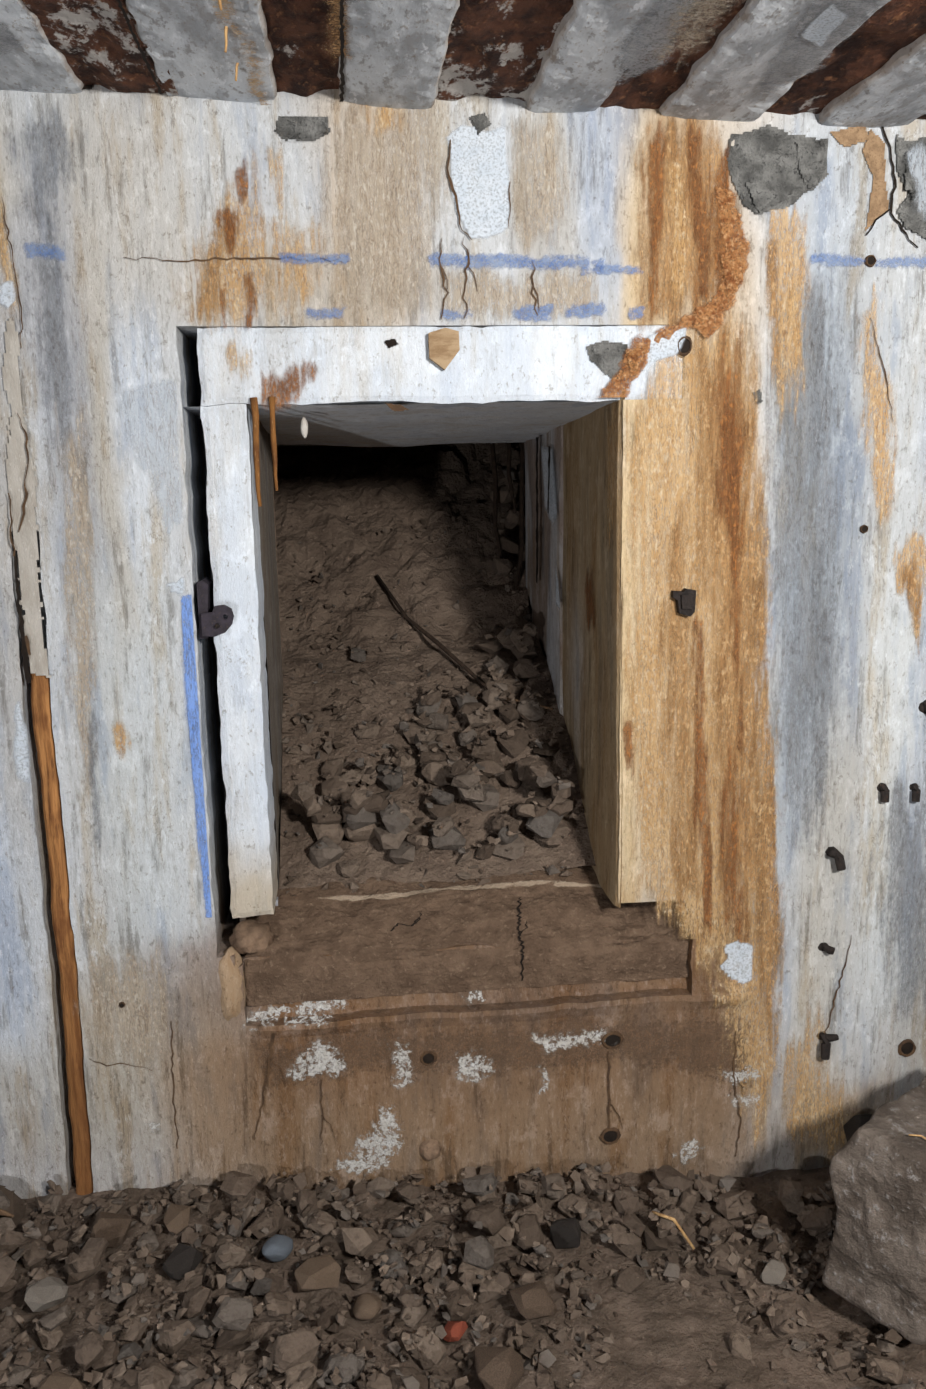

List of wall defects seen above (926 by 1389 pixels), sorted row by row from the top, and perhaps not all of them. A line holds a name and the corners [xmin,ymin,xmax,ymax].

peeling [762,0,878,95]
crack [124,255,349,263]
rust [192,151,315,328]
crack [438,139,478,319]
crack [531,262,539,316]
spalling [586,124,926,398]
rust [250,363,316,507]
crack [8,413,31,683]
rust [585,572,595,628]
rust [606,119,848,1160]
water stain [244,1000,760,1107]
efflorescence [330,1106,402,1174]